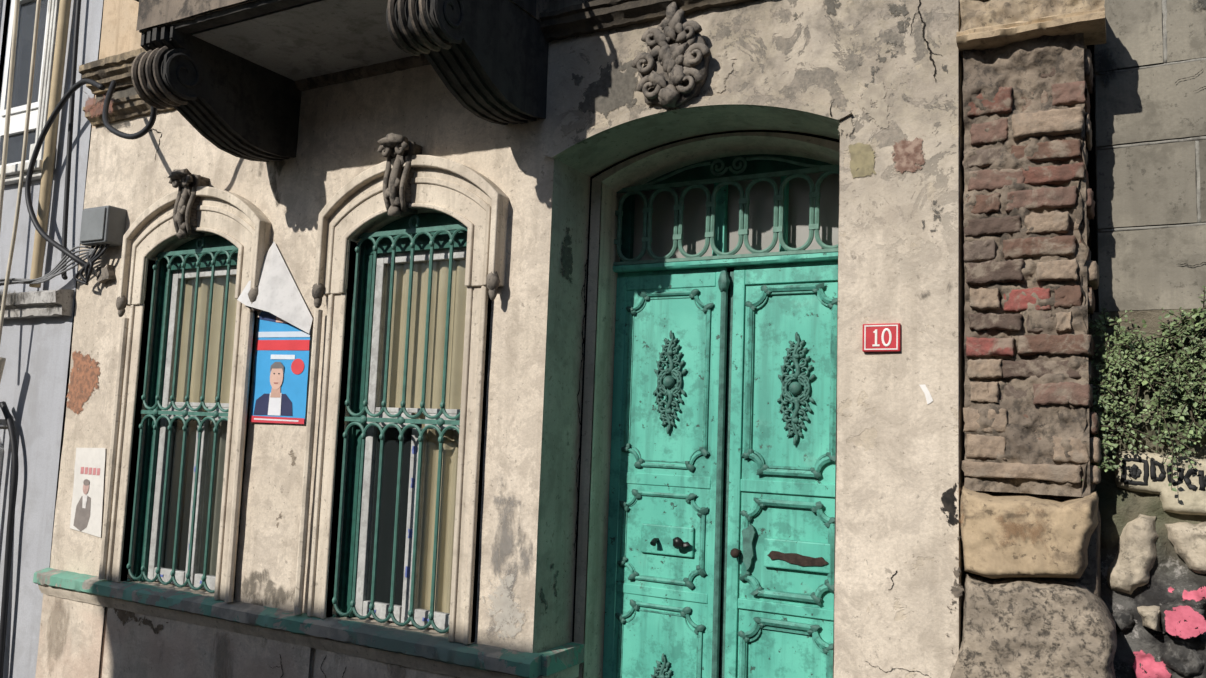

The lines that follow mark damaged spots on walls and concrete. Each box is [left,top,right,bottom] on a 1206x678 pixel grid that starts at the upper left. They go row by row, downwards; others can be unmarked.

crack [910,0,942,83]
flaking render [572,59,639,118]
spalling [66,350,100,414]
spalling [114,608,167,634]